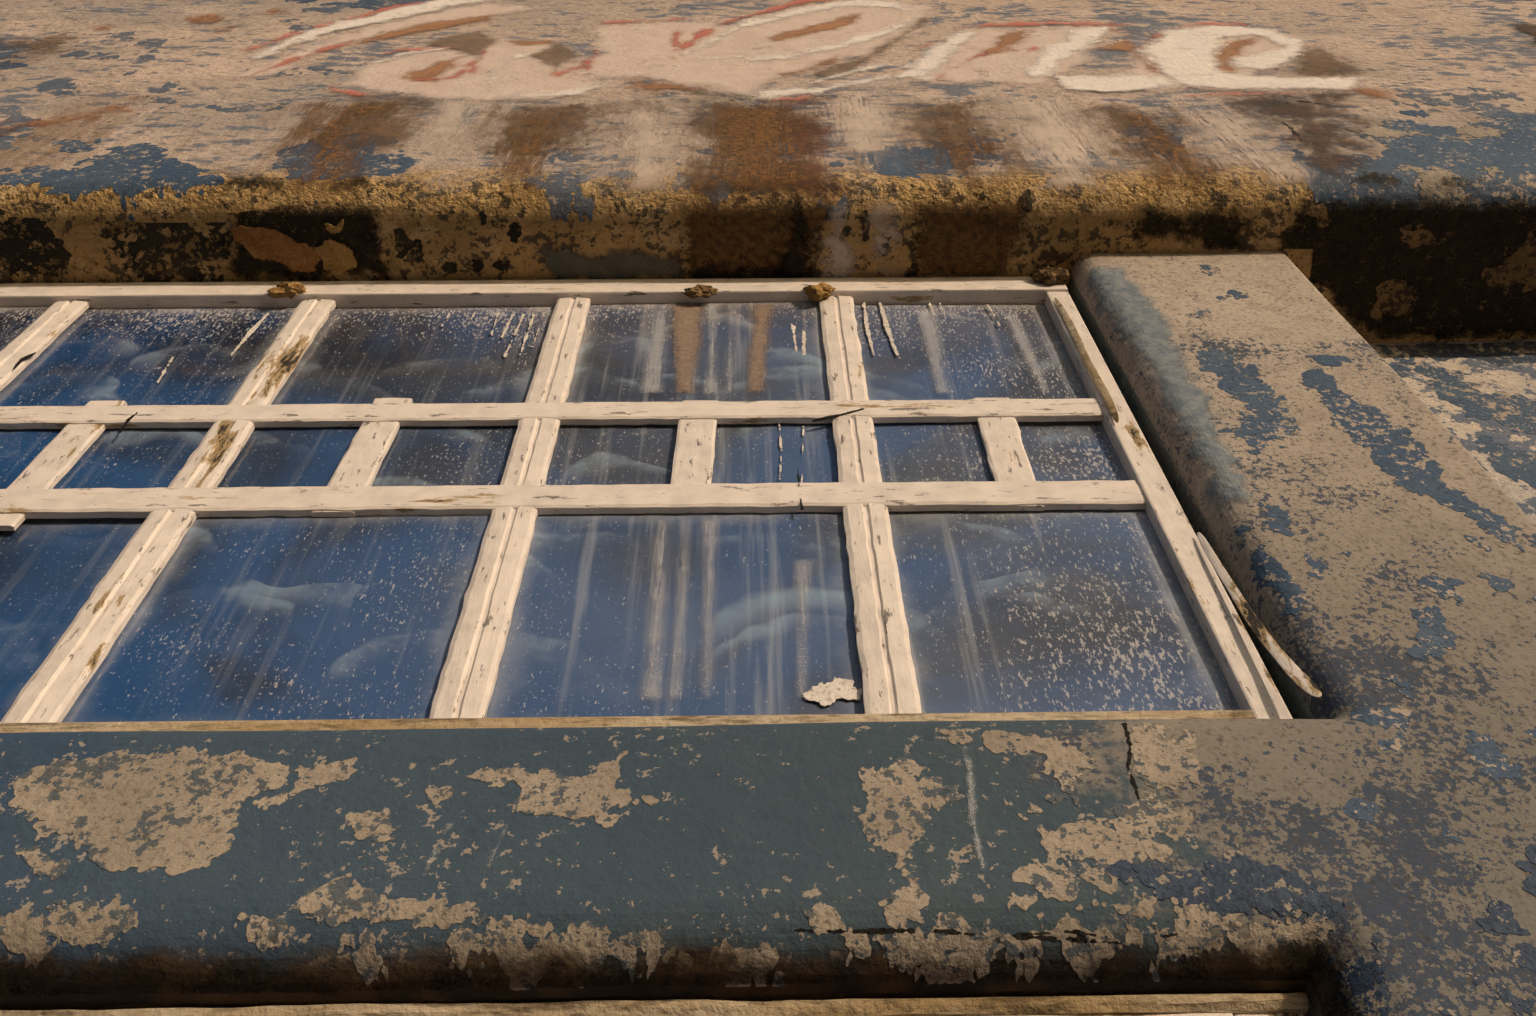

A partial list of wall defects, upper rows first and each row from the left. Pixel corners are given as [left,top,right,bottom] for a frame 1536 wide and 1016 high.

mould [0,209,72,277]
water stain [99,176,510,282]
water stain [539,203,822,280]
mould [1122,204,1248,250]
water stain [1227,49,1536,340]
peeling [1087,266,1352,619]
peeling [1301,341,1536,555]
peeling [425,750,659,828]
crack [1121,722,1140,800]
peeling [0,746,358,968]
peeling [804,722,1389,1016]
peeling [234,873,691,990]